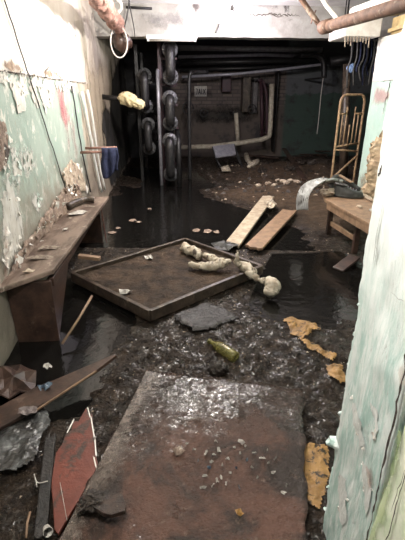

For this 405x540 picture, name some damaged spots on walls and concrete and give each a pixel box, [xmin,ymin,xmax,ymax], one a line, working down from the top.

peeling [0,68,77,114]
flaking render [0,120,88,276]
flaking render [360,130,383,199]